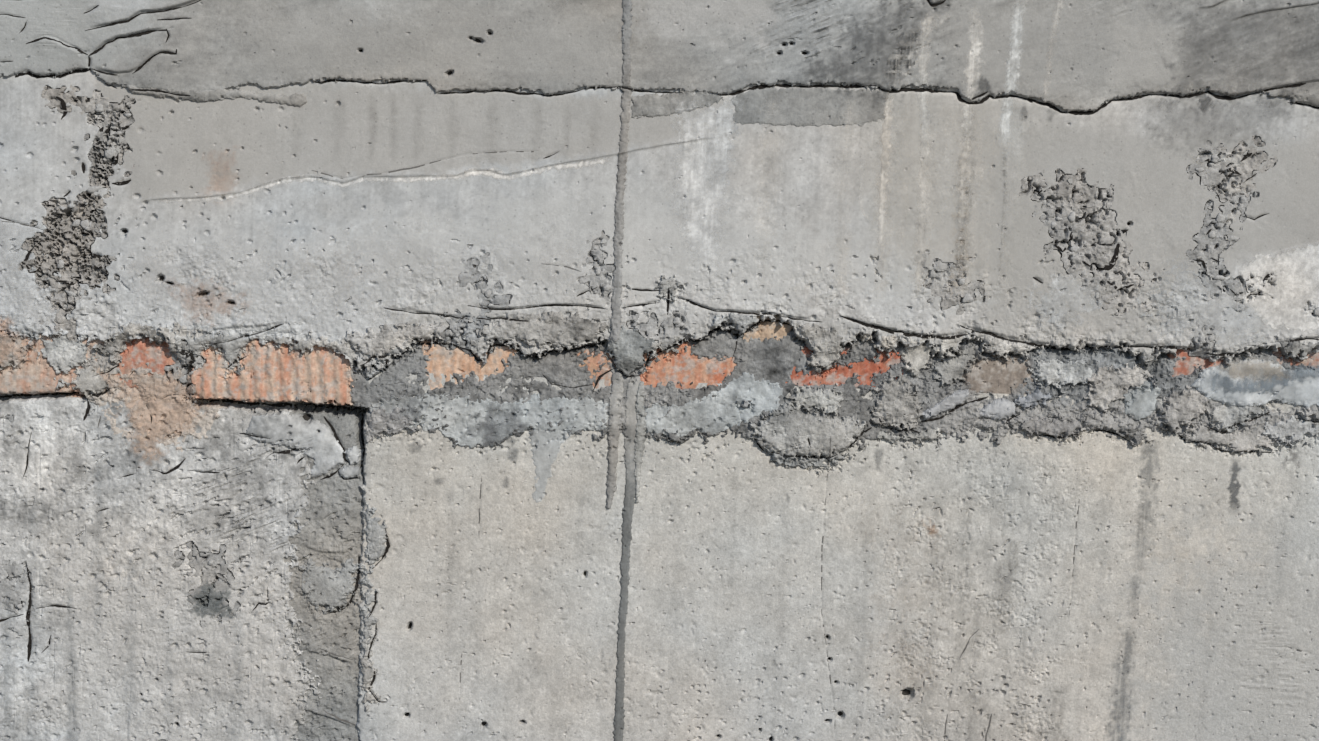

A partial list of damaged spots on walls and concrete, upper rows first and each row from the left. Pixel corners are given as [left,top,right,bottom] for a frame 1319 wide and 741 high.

crack [0,0,200,120]
crack [315,79,681,97]
crack [718,83,1319,115]
crack [0,125,131,288]
spalling [18,85,141,342]
crack [312,160,440,179]
spalling [1019,168,1155,316]
spalling [1185,135,1277,312]
spalling [164,338,205,405]
spalling [426,245,510,355]
spalling [627,310,698,350]
spalling [1188,326,1221,359]